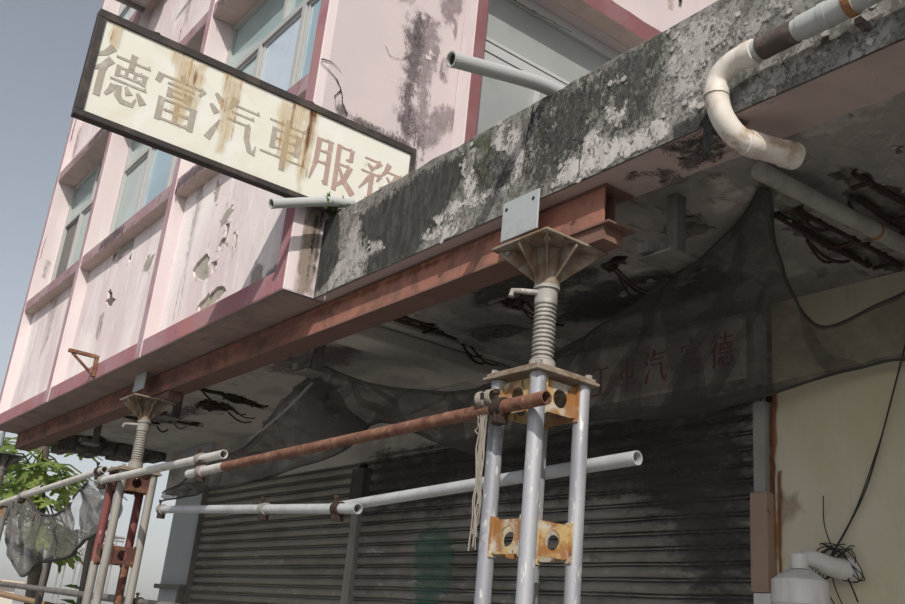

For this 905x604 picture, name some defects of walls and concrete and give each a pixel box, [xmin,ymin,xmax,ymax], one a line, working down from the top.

damp [336,0,666,275]
spalling [828,166,905,232]
spalling [193,202,239,310]
peeling [248,261,278,285]
damp [471,274,535,307]
spalling [774,202,905,273]
spalling [387,294,535,366]
spalling [195,388,268,423]